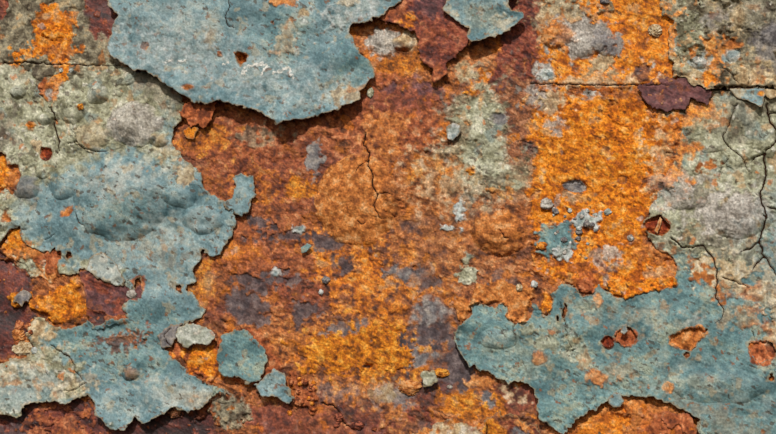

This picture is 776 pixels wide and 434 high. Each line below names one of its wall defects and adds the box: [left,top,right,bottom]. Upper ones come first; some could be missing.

rust [376,0,470,83]
rust [0,228,142,330]
rust [179,102,217,139]
peeling [0,0,402,431]
crack [356,133,394,225]
rust [451,0,776,324]
peeling [453,87,776,434]
crack [671,104,776,324]
rust [0,397,112,434]
rust [169,311,418,434]
rust [413,410,541,434]
rust [569,399,696,434]